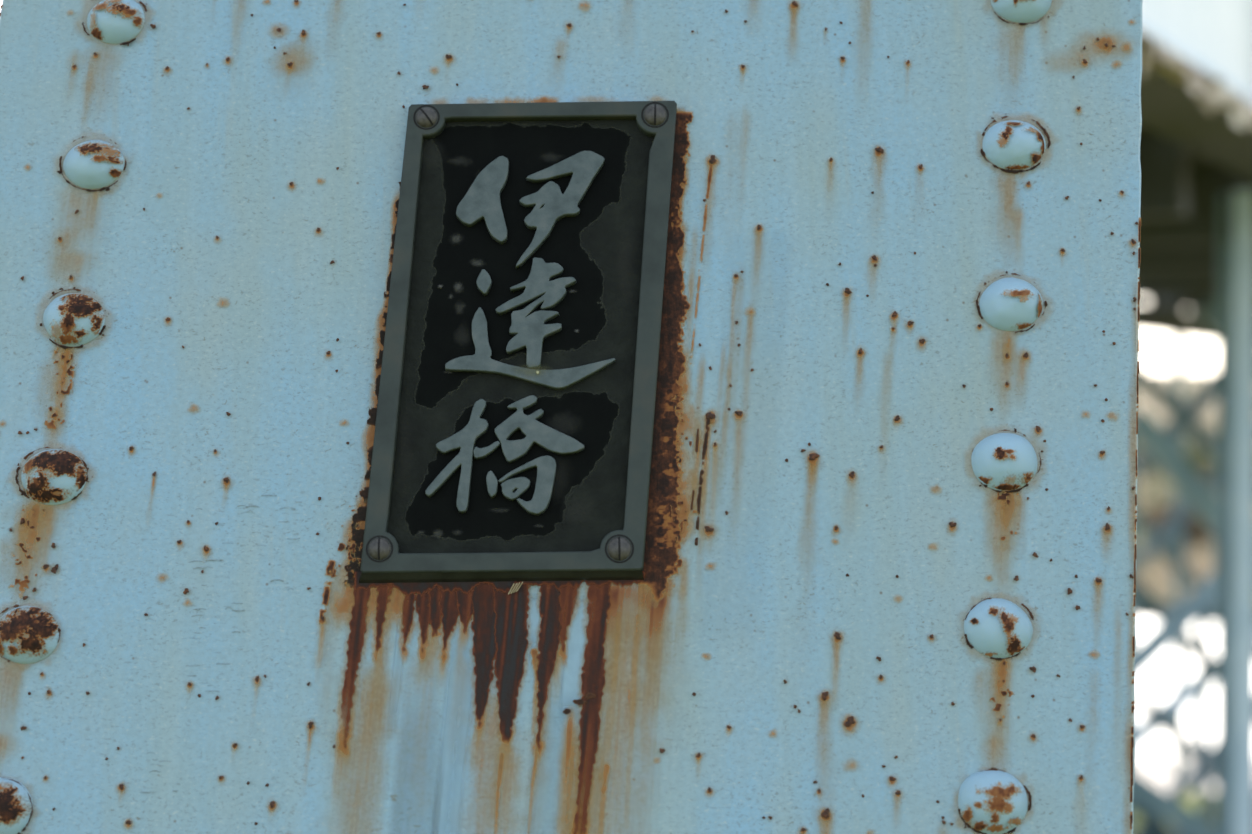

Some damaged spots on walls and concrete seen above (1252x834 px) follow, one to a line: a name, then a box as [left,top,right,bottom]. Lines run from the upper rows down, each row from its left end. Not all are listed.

corrosion [82,0,156,58]
corrosion [1072,36,1130,79]
corrosion [57,136,126,192]
corrosion [981,116,1051,203]
corrosion [18,275,109,434]
corrosion [333,110,743,834]
corrosion [979,426,1046,541]
corrosion [963,597,1034,723]
corrosion [0,778,33,834]
corrosion [936,768,1032,834]